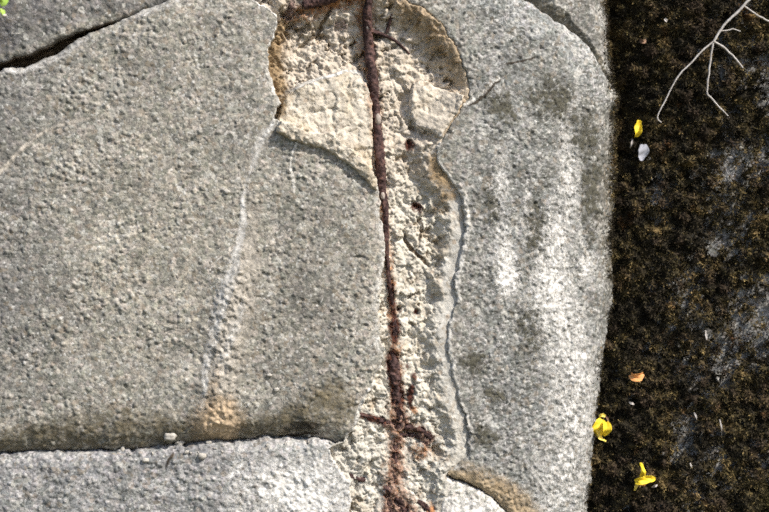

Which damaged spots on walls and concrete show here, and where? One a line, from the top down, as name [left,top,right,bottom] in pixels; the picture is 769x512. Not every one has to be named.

crack [0,21,116,71]
corrosion [284,0,368,72]
spalling [254,0,474,512]
corrosion [360,244,435,512]
crack [288,422,319,436]